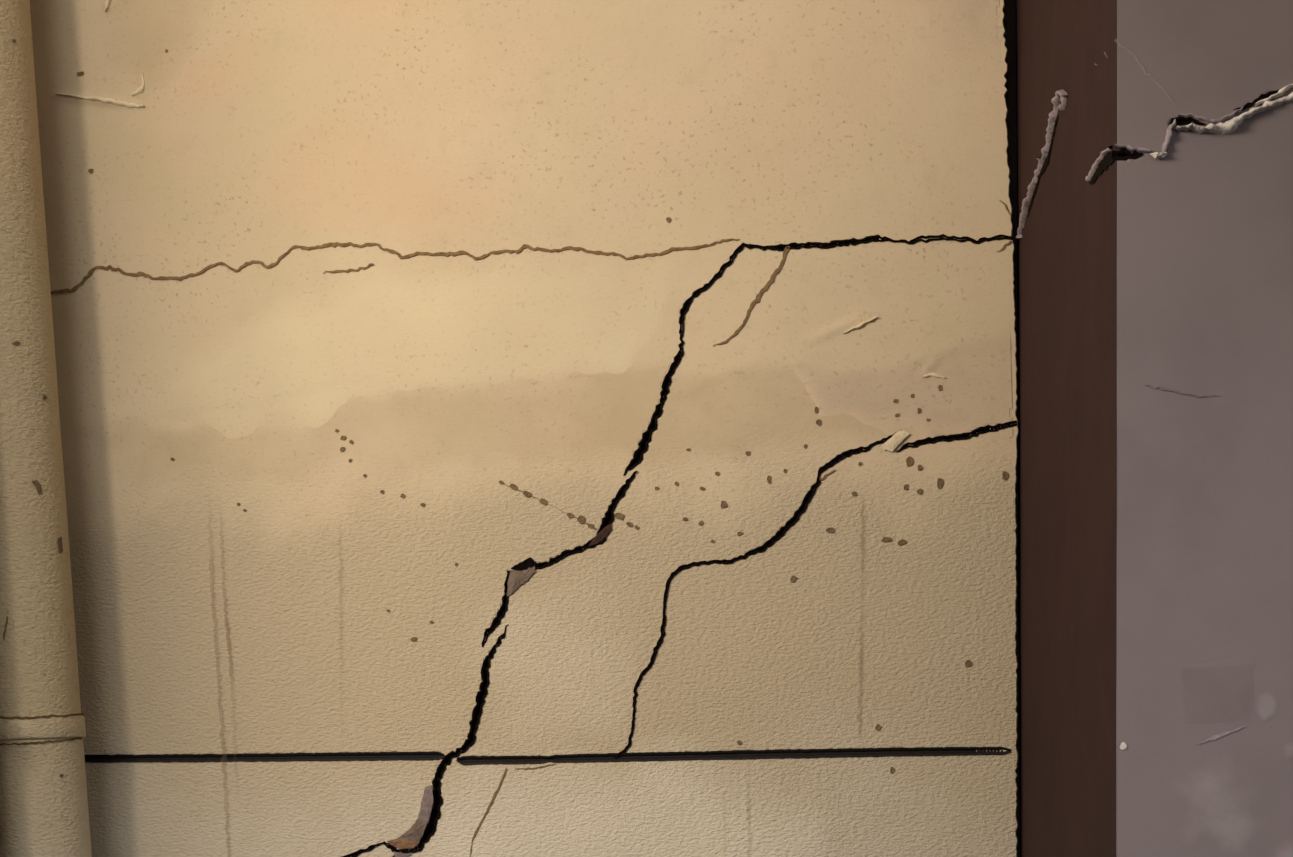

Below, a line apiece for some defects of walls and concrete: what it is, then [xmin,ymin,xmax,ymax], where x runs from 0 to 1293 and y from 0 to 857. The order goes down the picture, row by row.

crack [1085,84,1293,184]
crack [51,89,1068,857]
spalling [507,557,537,596]
spalling [388,785,433,857]